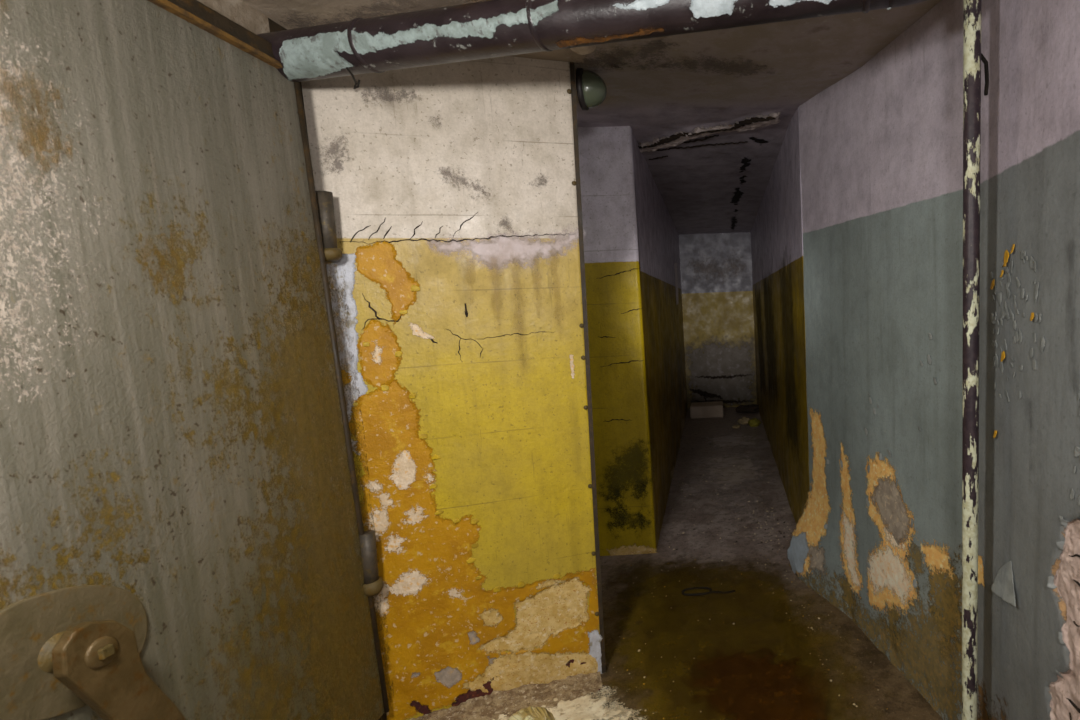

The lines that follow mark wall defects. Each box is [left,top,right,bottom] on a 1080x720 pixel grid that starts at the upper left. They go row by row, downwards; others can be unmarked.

crack [342,212,573,244]
crack [362,294,402,330]
crack [447,303,554,361]
peeling [326,240,602,720]
damp [599,440,653,537]
flaking render [606,543,658,556]
peeling [787,407,953,615]
damp [602,542,962,720]
flaking render [1046,516,1080,720]